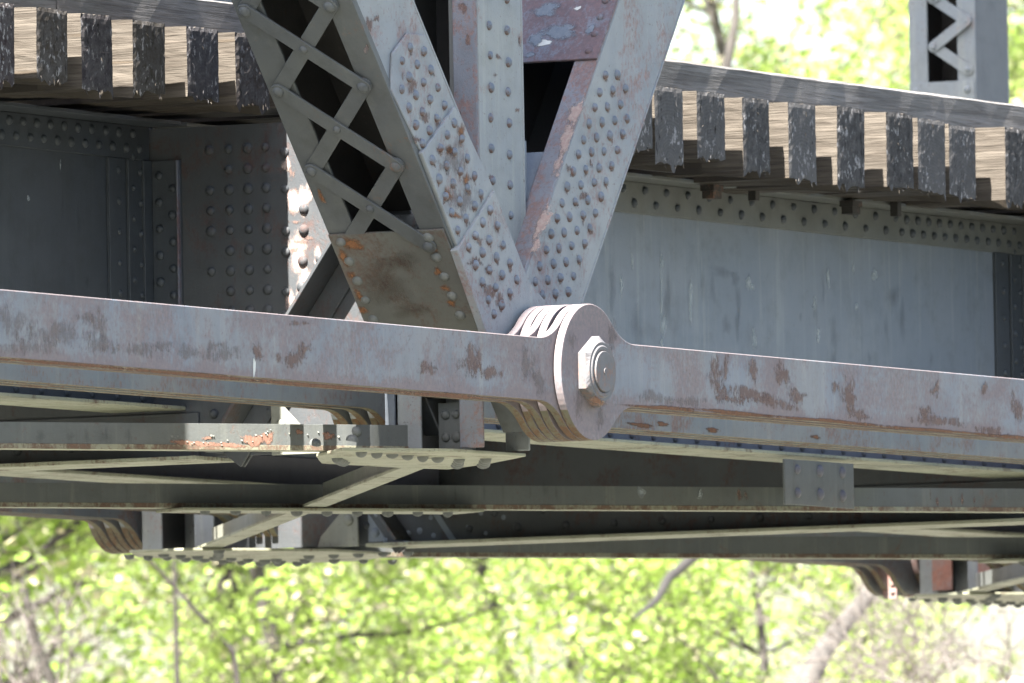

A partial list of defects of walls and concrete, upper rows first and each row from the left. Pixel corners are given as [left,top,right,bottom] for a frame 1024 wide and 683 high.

peeling [525,2,594,57]
corrosion [276,342,311,368]
corrosion [457,344,503,380]
corrosion [627,354,1024,440]
peeling [171,429,274,448]